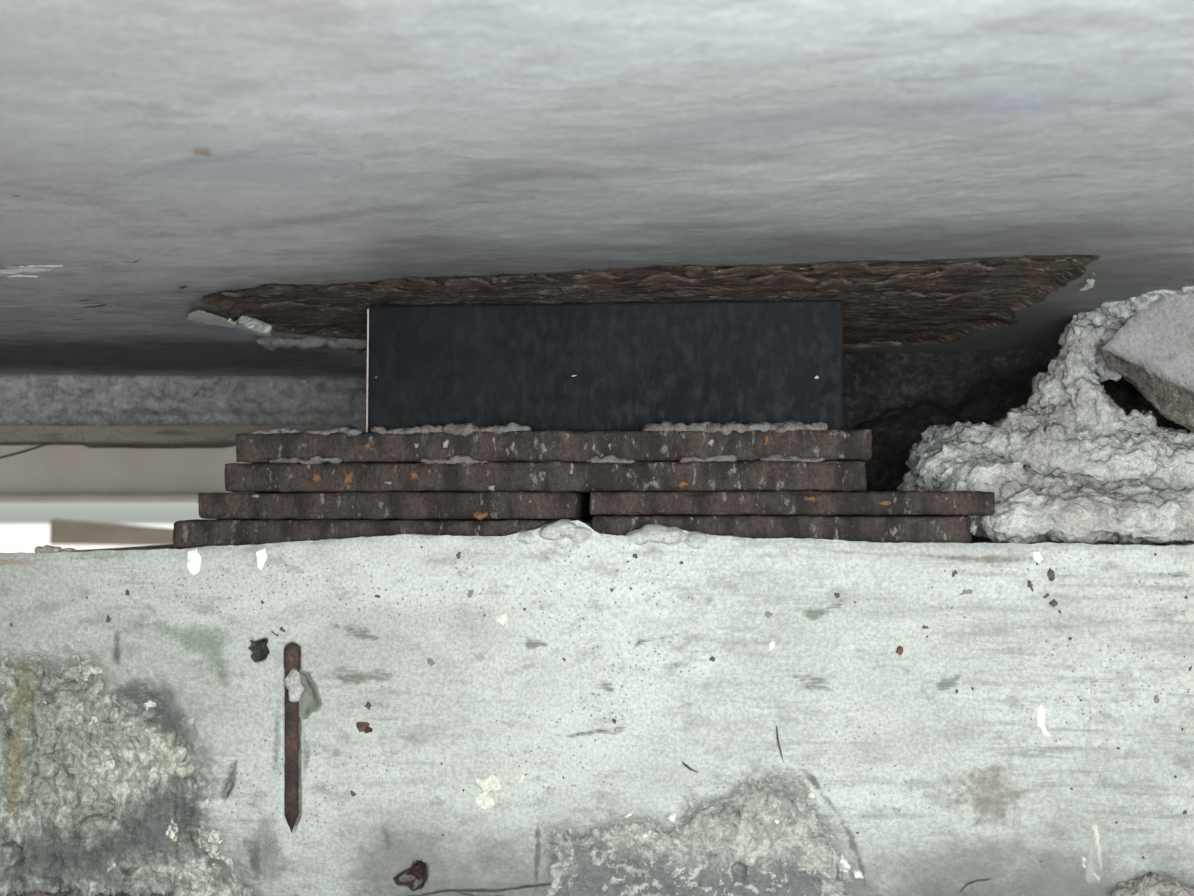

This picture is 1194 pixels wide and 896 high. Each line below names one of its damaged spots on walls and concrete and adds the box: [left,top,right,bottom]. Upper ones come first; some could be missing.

peeling [0,265,62,277]
spalling [185,255,1099,355]
spalling [0,644,254,896]
corrosion [284,643,305,833]
spalling [543,766,875,896]